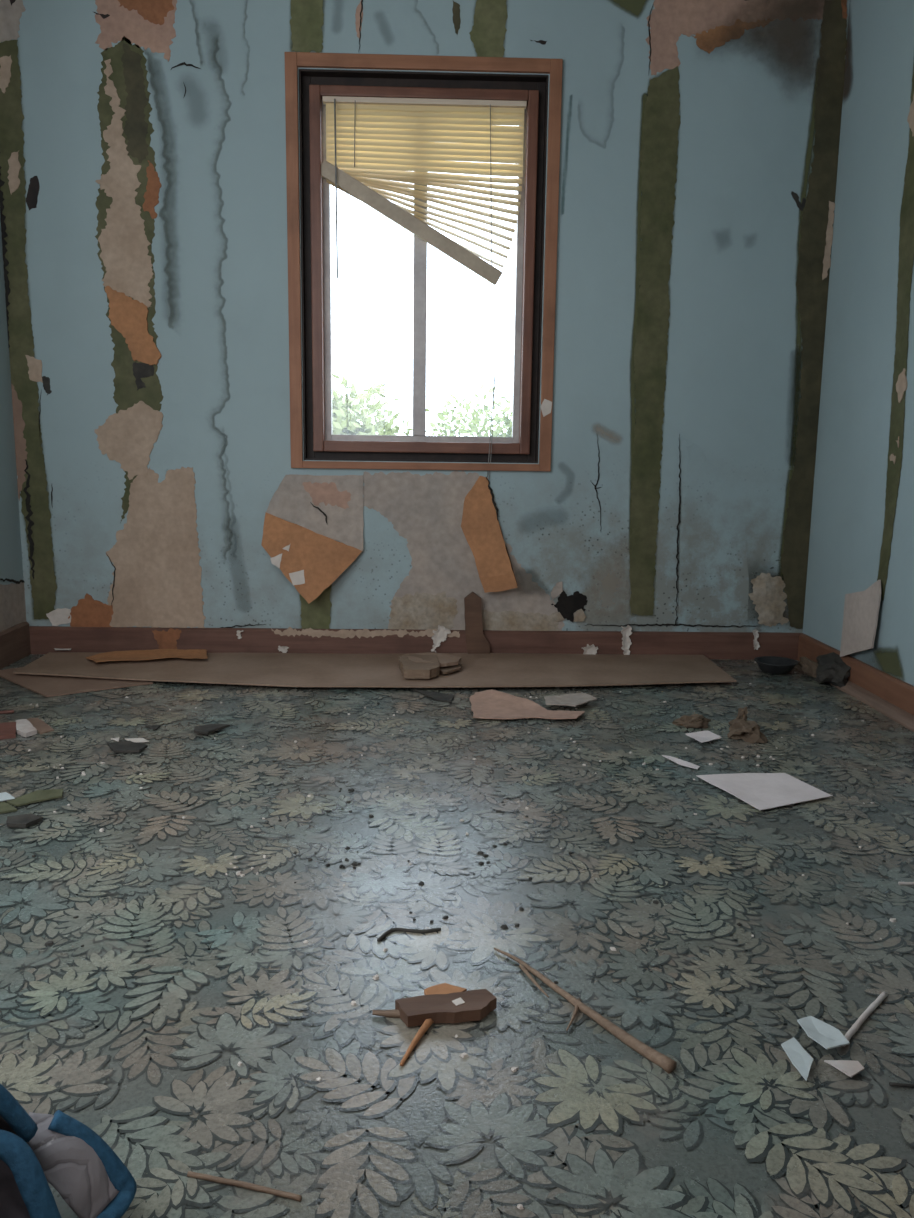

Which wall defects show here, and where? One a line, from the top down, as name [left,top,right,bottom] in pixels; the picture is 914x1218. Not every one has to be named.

peeling [645,0,781,75]
peeling [46,0,206,628]
peeling [270,471,588,653]
crack [587,434,756,628]